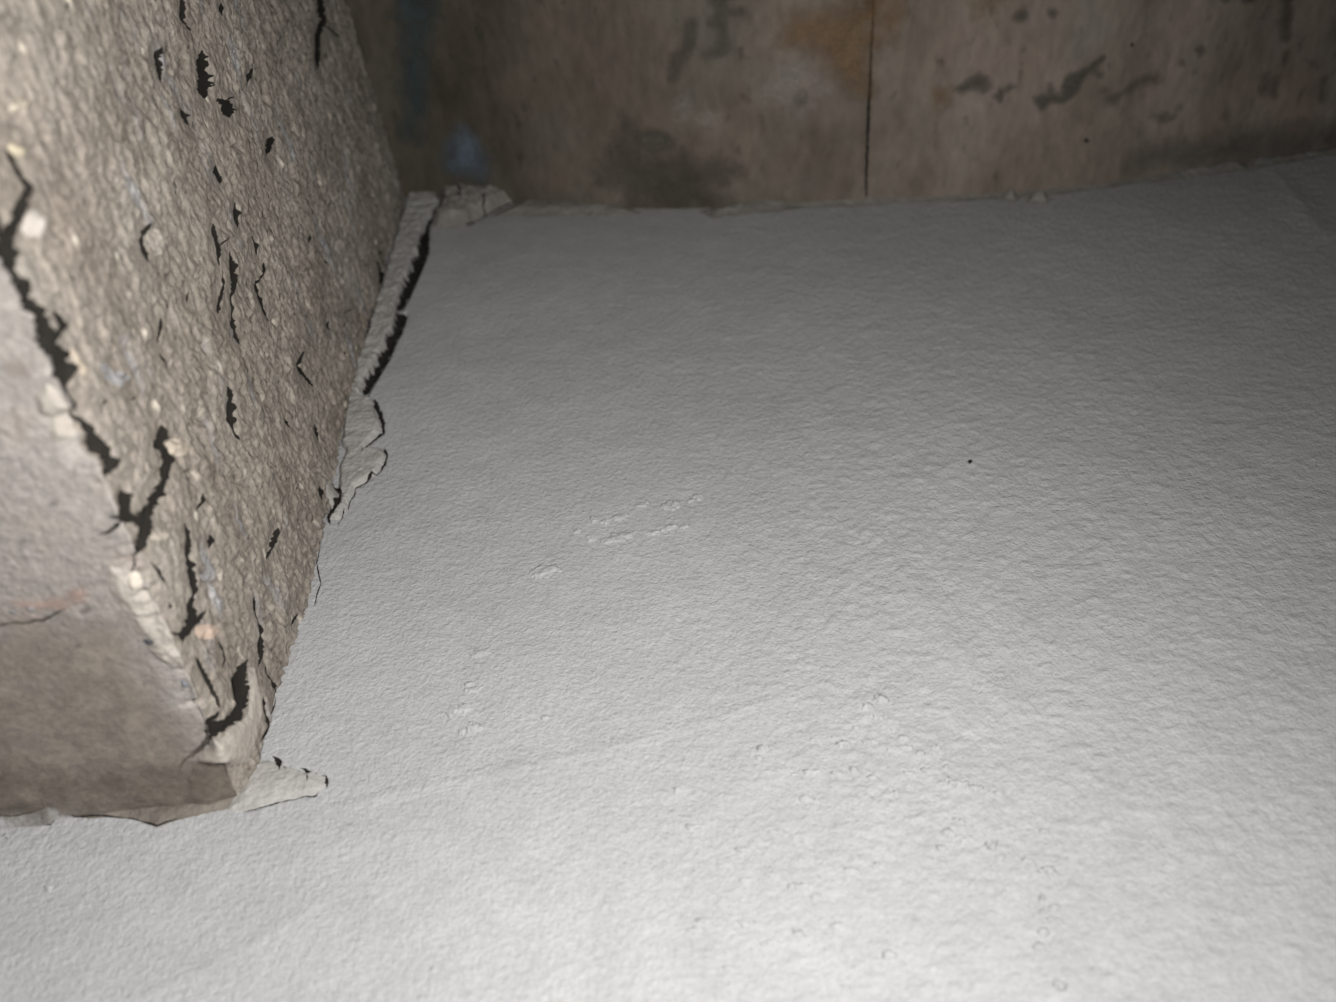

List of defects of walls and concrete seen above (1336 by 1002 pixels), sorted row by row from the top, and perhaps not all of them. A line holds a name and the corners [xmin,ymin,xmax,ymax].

crack [154,0,253,126]
crack [315,0,340,70]
leakage [1038,58,1104,108]
crack [265,136,275,155]
flaking render [21,209,48,237]
flaking render [69,346,131,387]
spalling [34,383,77,443]
flaking render [165,438,189,457]
crack [0,147,514,812]
spalling [108,566,189,687]
flaking render [195,623,219,640]
spalling [77,762,236,827]